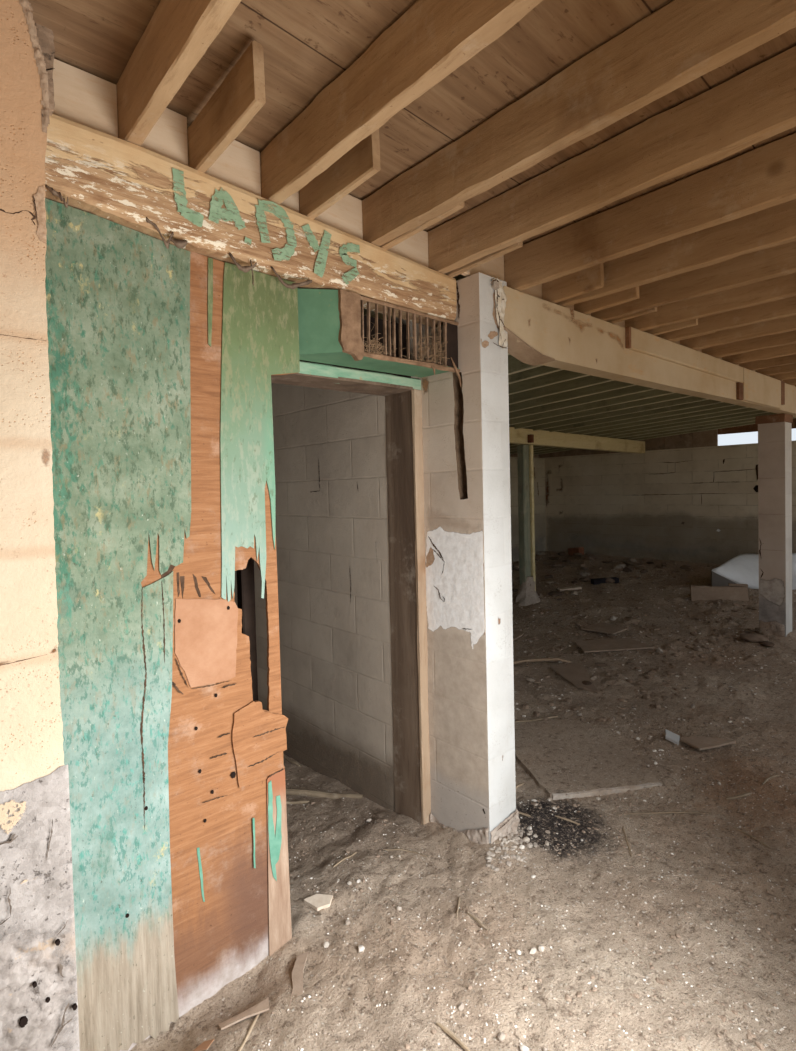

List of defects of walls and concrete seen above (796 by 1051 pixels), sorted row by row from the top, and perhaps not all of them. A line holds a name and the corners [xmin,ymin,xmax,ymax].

crack [0,209,35,225]
peeling [425,527,485,649]
peeling [0,764,80,1051]